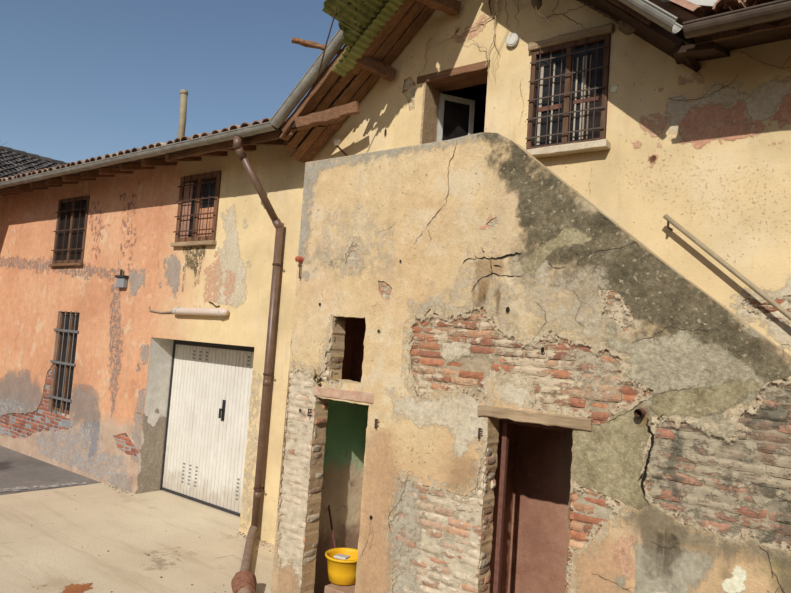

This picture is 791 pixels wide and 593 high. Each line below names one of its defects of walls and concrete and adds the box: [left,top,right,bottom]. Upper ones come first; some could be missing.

peeling [620,72,791,243]
peeling [193,205,251,308]
spalling [379,281,392,300]
crack [463,249,521,292]
leakage [478,132,791,382]
spalling [0,365,75,439]
peeling [113,409,167,494]
peeling [383,285,791,593]
crack [592,385,697,506]
leakage [630,503,737,593]